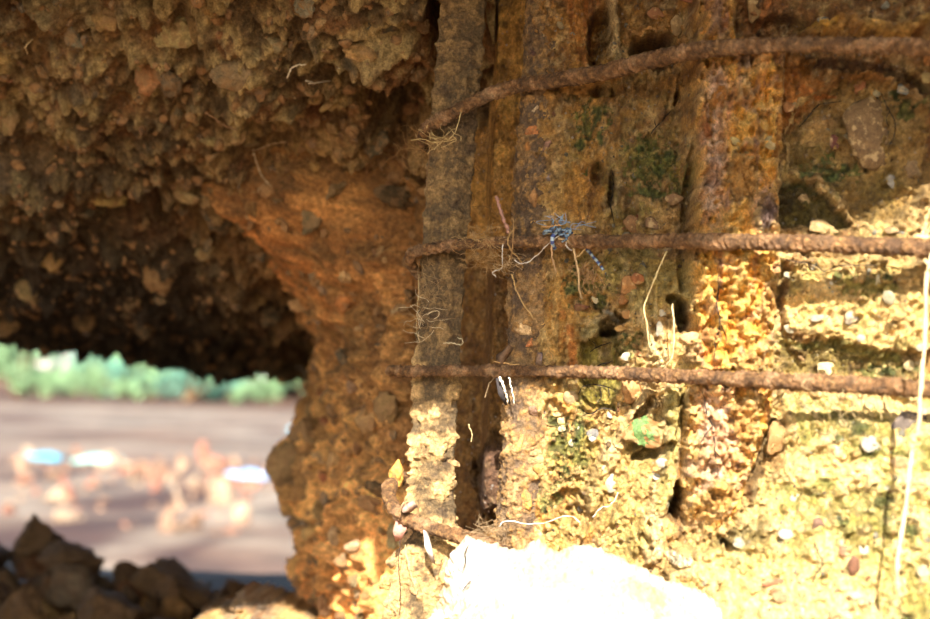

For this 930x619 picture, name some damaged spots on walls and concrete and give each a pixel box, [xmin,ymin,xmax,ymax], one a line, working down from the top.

corrosion [769,52,837,158]
spalling [784,69,930,226]
corrosion [557,157,609,230]
corrosion [542,250,583,366]
peeling [576,309,622,367]
spalling [666,296,690,334]
spalling [776,253,930,359]
peeling [576,377,622,424]
corrosion [673,384,694,515]
crack [698,392,723,468]
corrosion [533,489,560,533]
spalling [666,479,681,523]